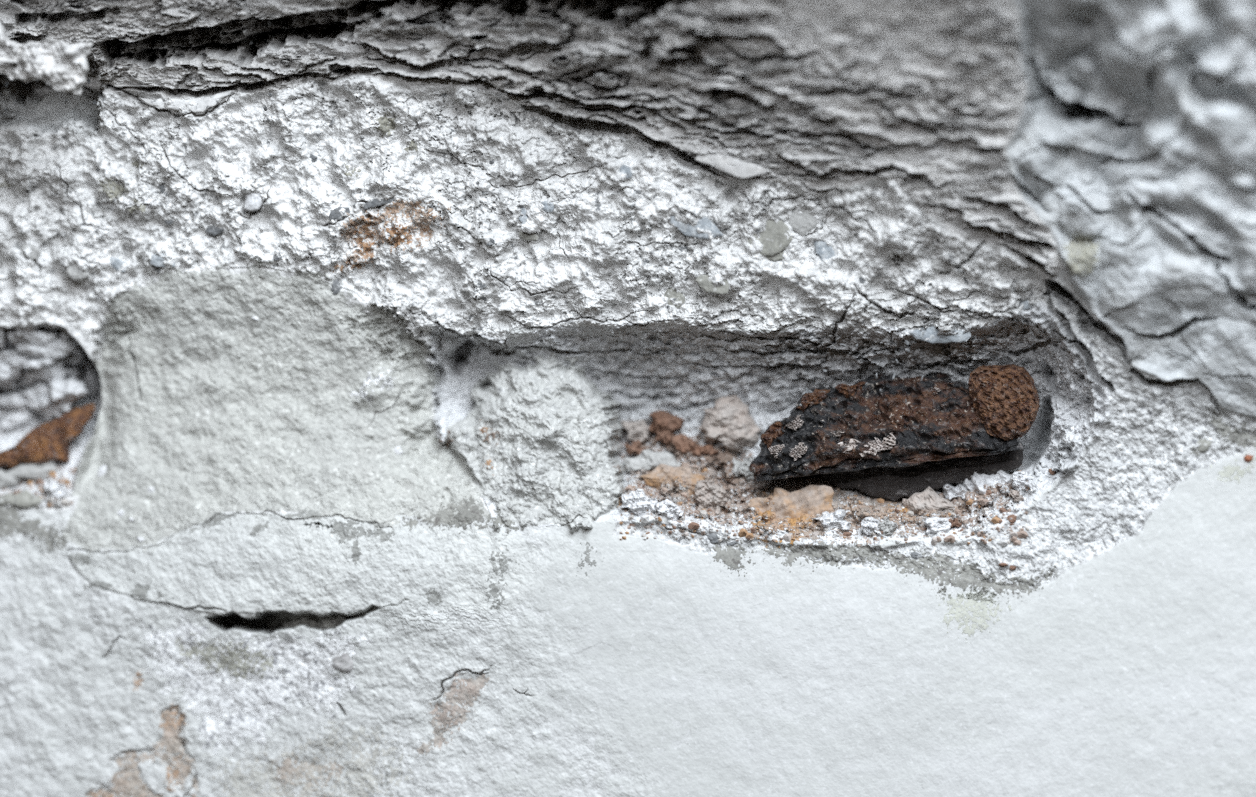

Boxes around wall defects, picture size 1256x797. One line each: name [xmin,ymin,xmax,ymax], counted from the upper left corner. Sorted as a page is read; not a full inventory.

crack [106,84,271,219]
crack [425,149,635,201]
rust [328,199,451,274]
crack [738,191,878,236]
crack [427,225,676,369]
spalling [0,22,1256,591]
crack [720,284,1040,346]
rust [796,382,867,413]
rust [0,404,95,468]
rust [609,418,1023,549]
crack [153,602,377,633]
crack [434,665,531,700]